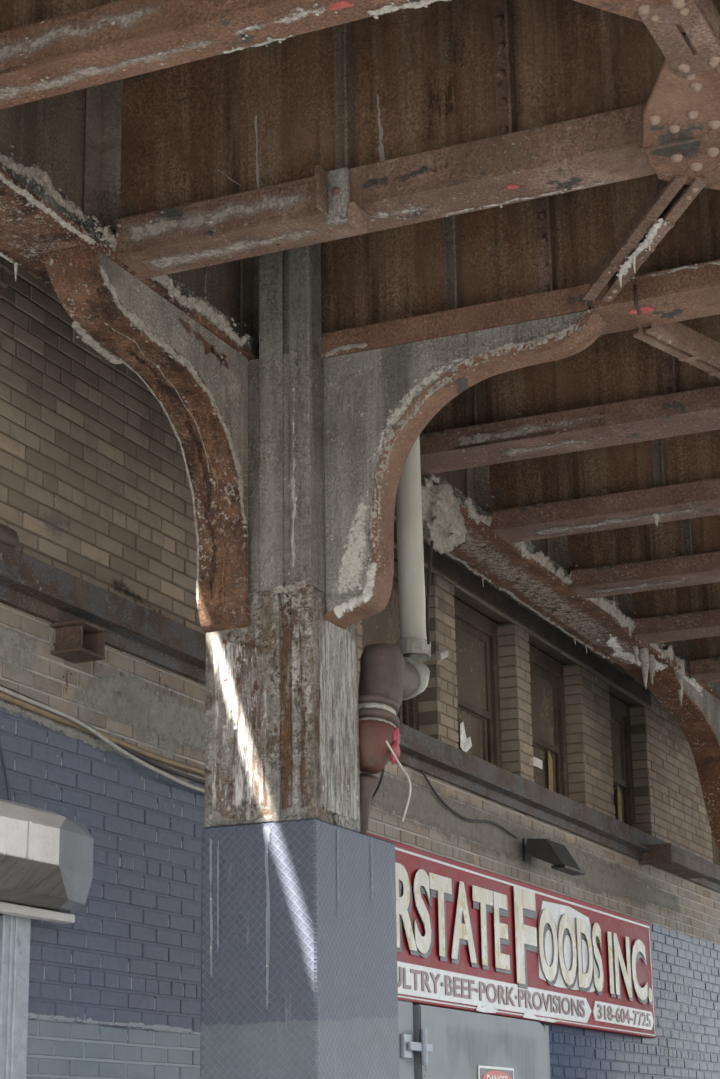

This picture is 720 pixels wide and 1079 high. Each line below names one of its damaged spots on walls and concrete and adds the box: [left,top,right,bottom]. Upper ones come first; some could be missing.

damp [0,141,252,607]
corrosion [223,602,325,810]